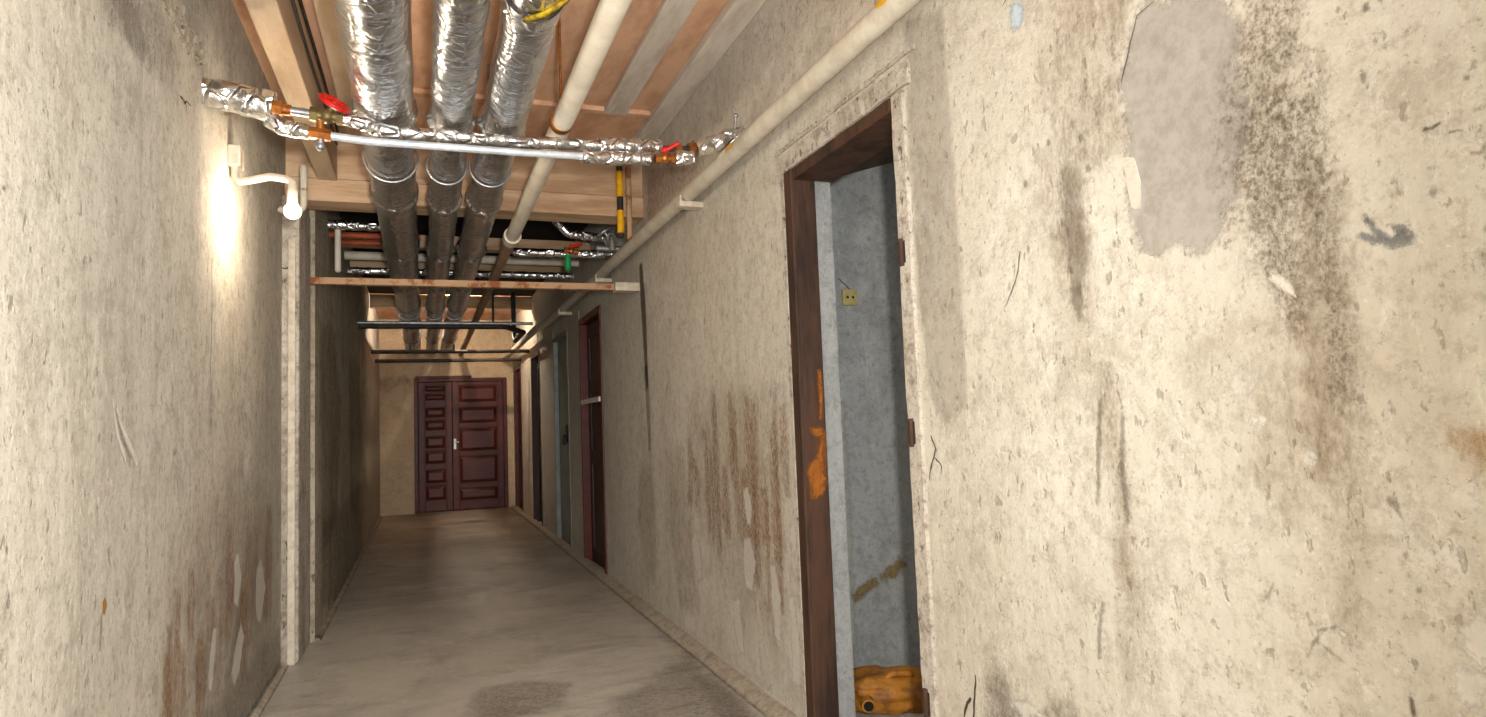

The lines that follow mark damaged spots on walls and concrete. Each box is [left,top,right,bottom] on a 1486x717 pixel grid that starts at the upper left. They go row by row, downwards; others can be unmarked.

peeling [1118,0,1252,274]
corrosion [688,400,789,603]
corrosion [164,509,272,717]
water stain [1015,701,1042,717]